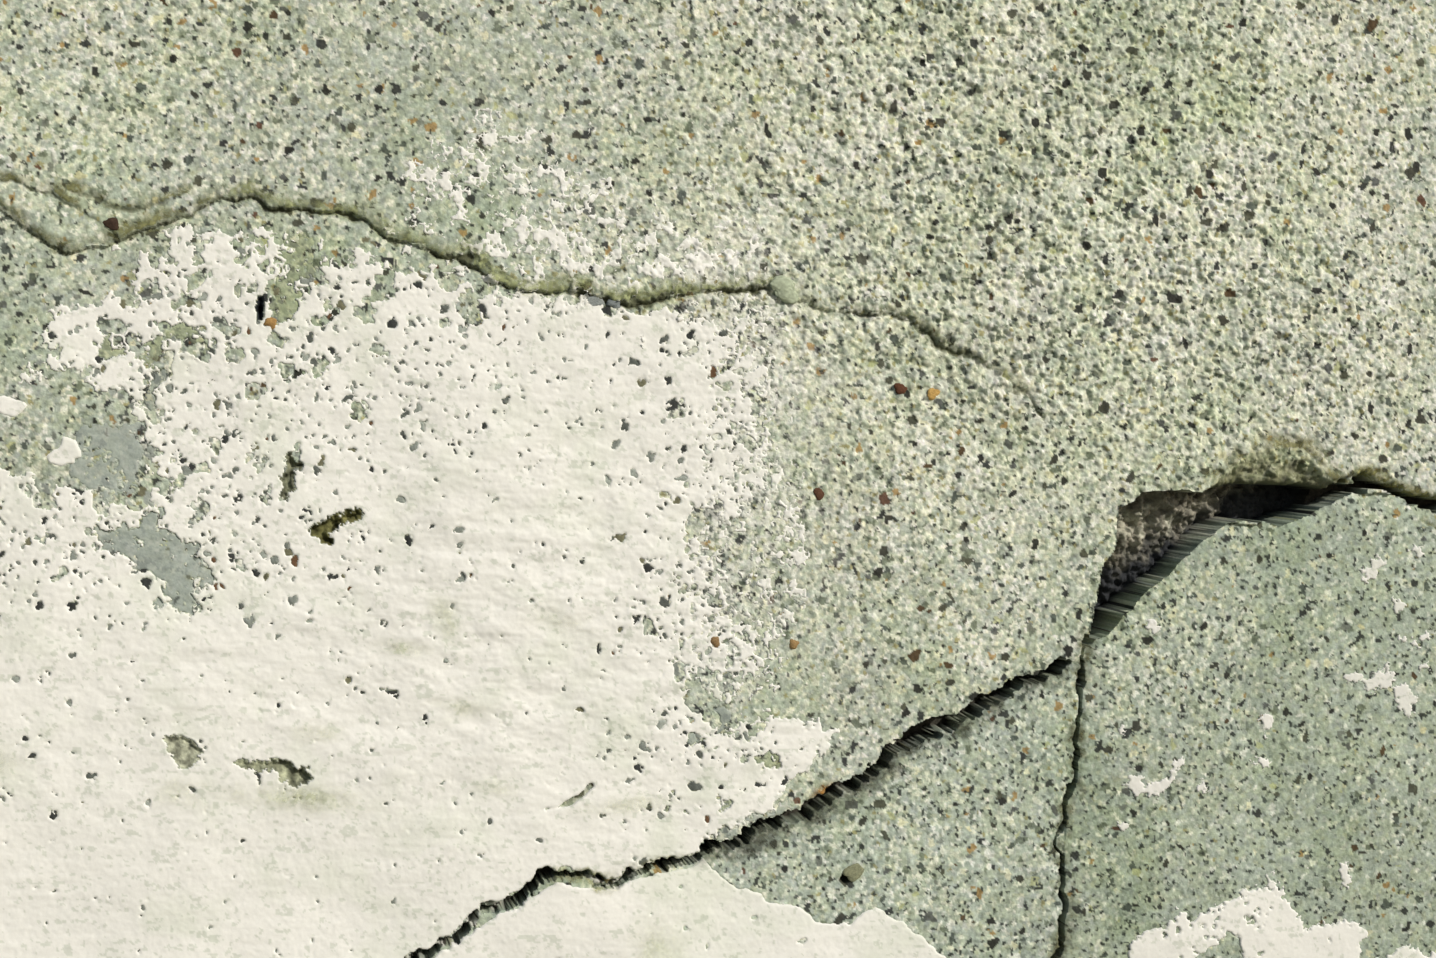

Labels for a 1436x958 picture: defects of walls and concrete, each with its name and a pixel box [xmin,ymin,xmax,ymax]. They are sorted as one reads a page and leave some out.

crack [0,189,773,310]
crack [809,302,1054,444]
crack [1300,474,1436,514]
peeling [0,223,946,958]
crack [404,634,1090,958]
peeling [1127,871,1436,958]